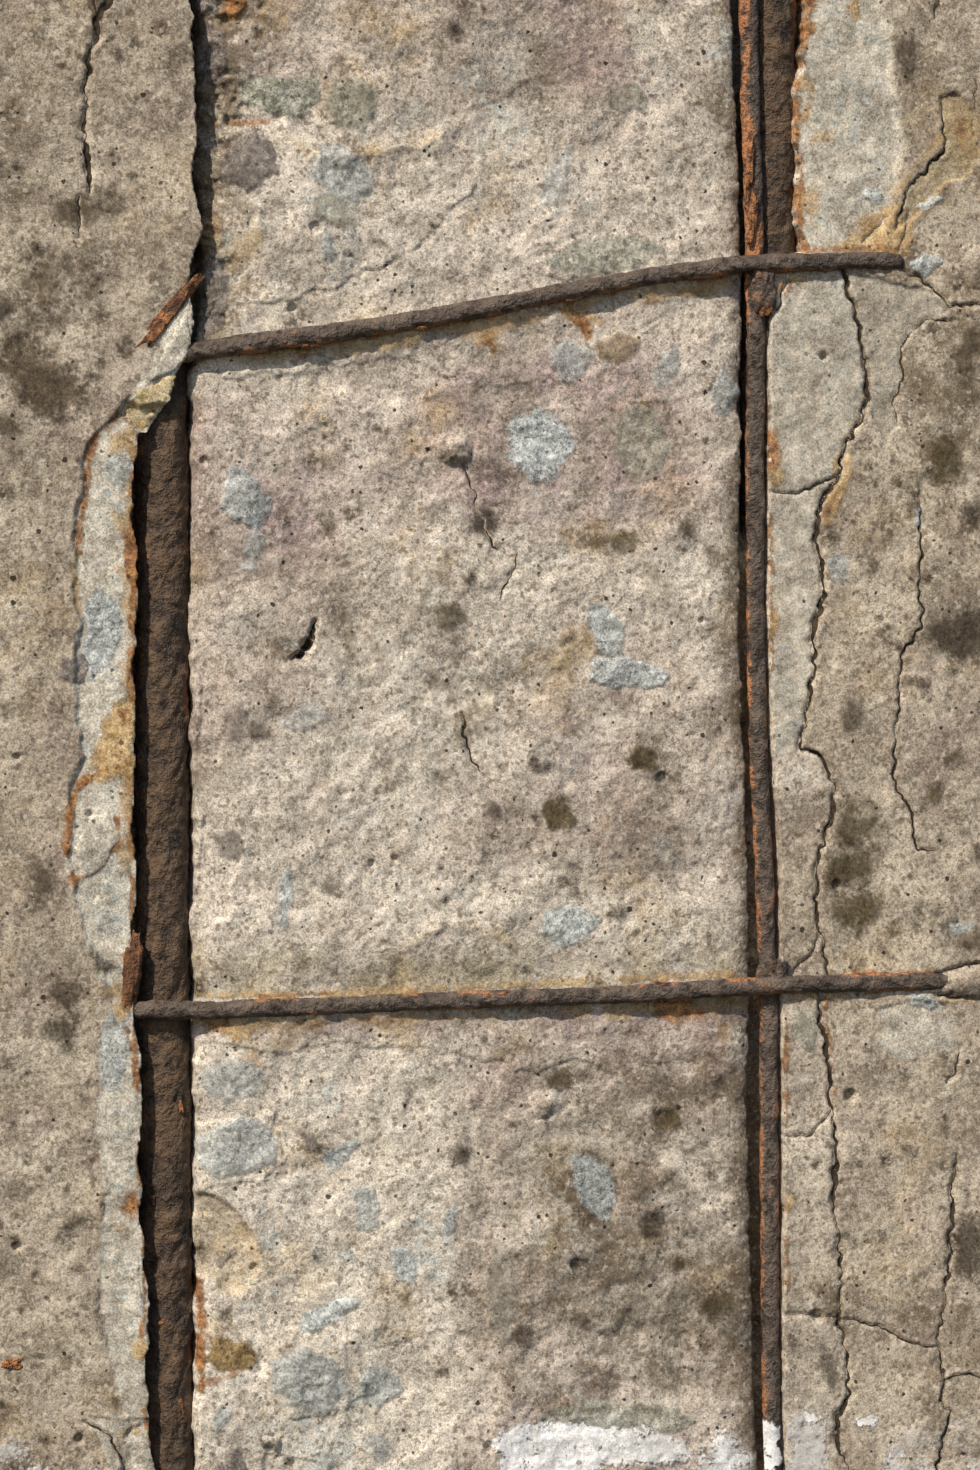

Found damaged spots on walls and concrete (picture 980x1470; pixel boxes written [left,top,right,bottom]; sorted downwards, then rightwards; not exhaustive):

crack [77,0,113,237]
corrosion [744,132,759,245]
corrosion [549,296,600,340]
spalling [65,297,204,992]
crack [774,84,980,1470]
corrosion [619,970,734,1022]
spalling [97,1043,148,1418]
corrosion [119,1142,166,1360]
corrosion [191,1272,207,1392]
peeling [803,1411,823,1422]
peeling [852,1415,878,1427]
peeling [878,1449,935,1470]